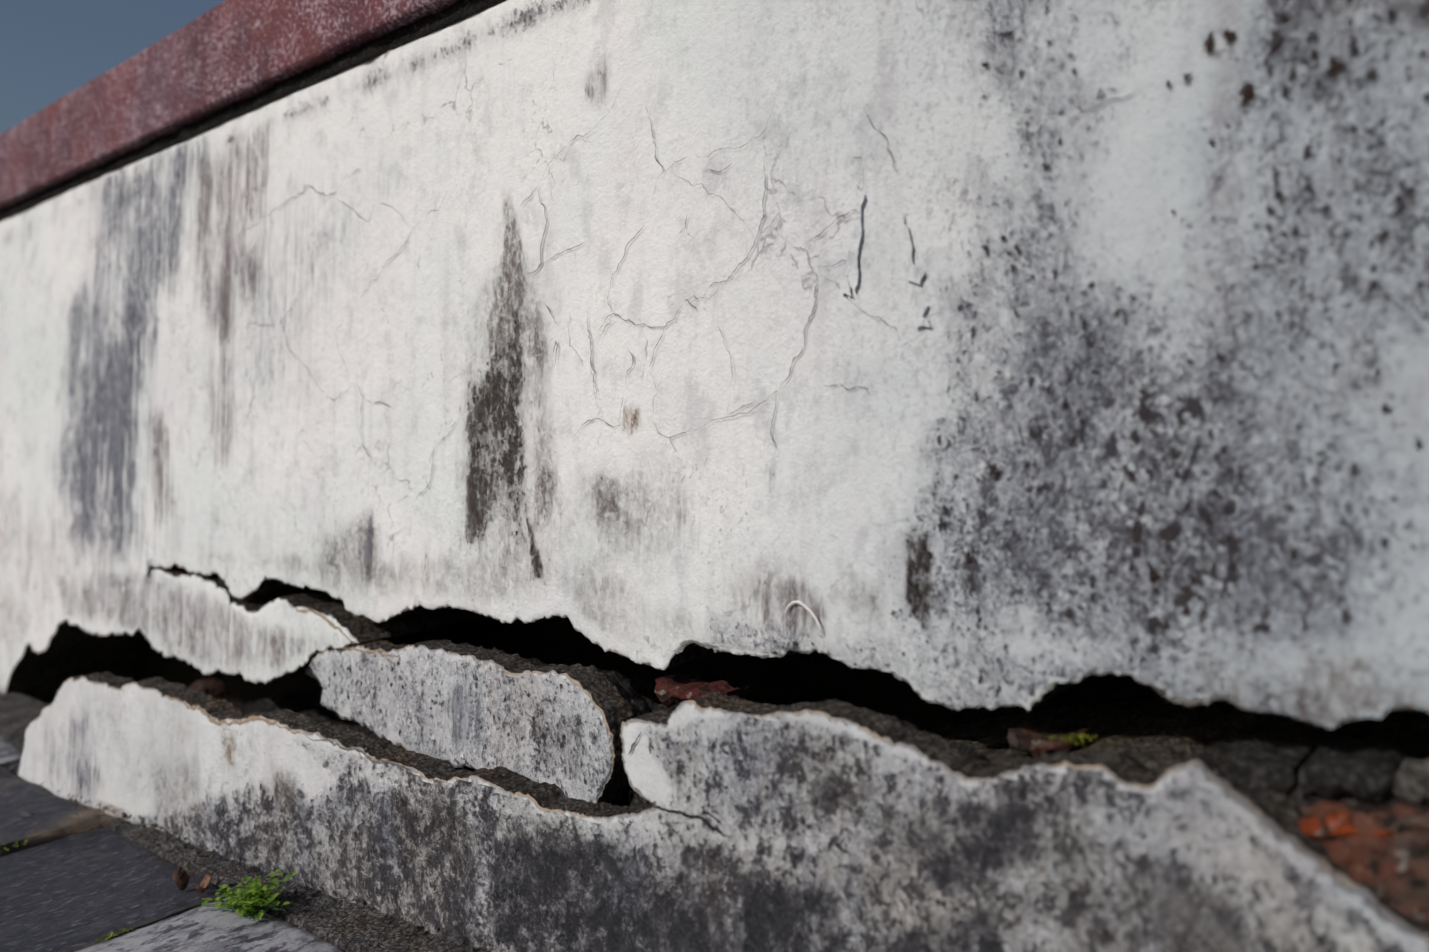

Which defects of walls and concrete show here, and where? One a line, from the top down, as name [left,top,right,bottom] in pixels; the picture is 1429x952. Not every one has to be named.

leakage [362,0,589,86]
leakage [52,125,303,665]
leakage [456,204,561,584]
crack [522,92,896,449]
leakage [710,0,1429,719]
leakage [326,518,399,594]
crack [133,606,406,769]
leakage [134,648,1401,952]
crack [439,617,1245,838]
spalling [944,697,1429,925]
crack [1222,757,1429,817]
crack [1389,707,1429,715]